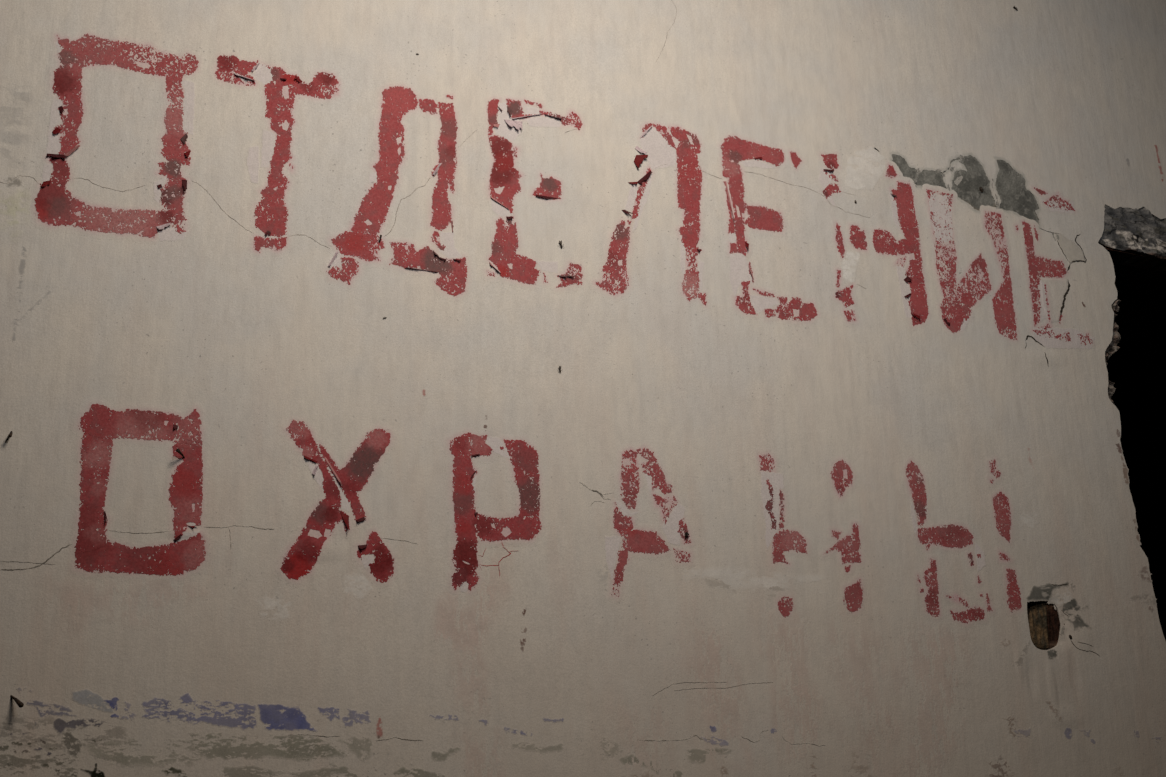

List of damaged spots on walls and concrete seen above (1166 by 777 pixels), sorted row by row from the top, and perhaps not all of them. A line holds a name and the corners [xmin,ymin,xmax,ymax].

spalling [874,148,1075,245]
spalling [1098,205,1166,271]
spalling [1025,580,1092,636]